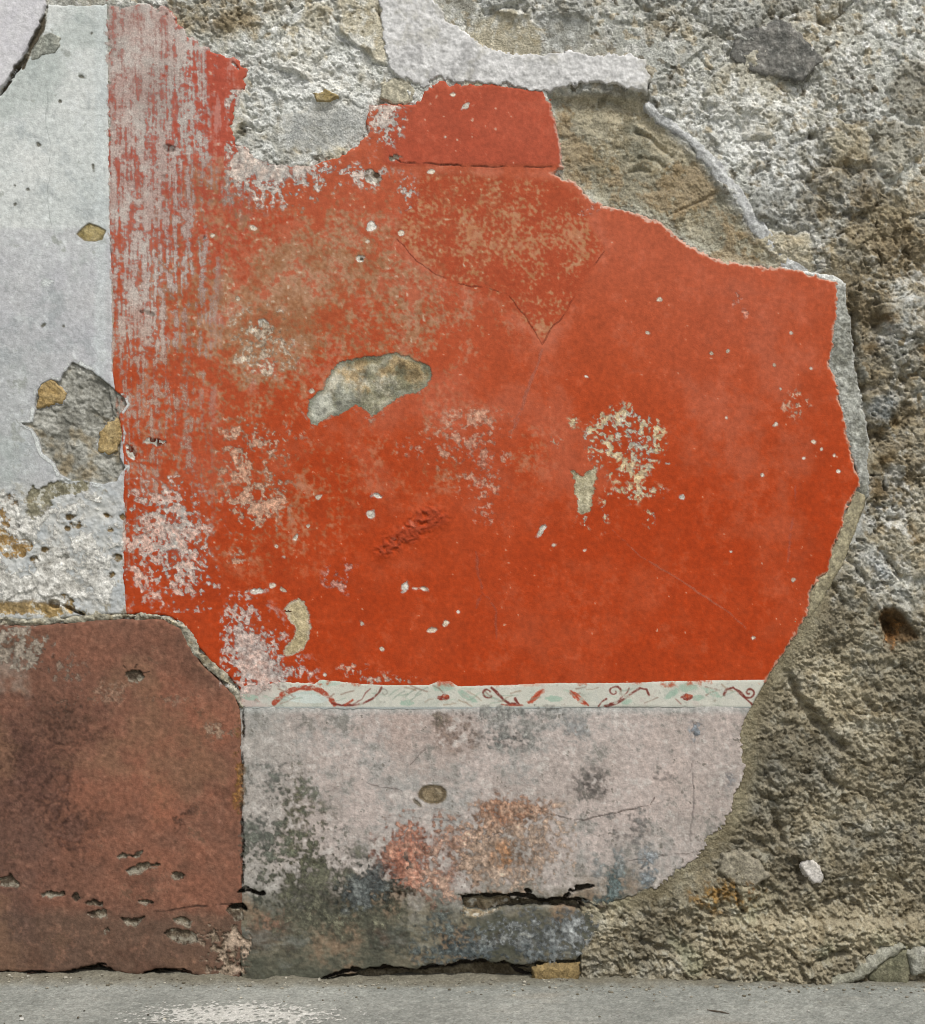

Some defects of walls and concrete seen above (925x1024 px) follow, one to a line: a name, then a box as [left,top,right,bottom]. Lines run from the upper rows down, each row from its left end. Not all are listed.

crack [0,15,46,96]
crack [396,159,551,168]
peeling [0,0,410,702]
spalling [305,352,432,425]
peeling [569,403,668,526]
peeling [118,851,160,875]
peeling [42,891,109,934]
peeling [121,900,153,927]
crack [462,883,595,906]
peeling [164,903,252,976]
crack [323,958,533,978]